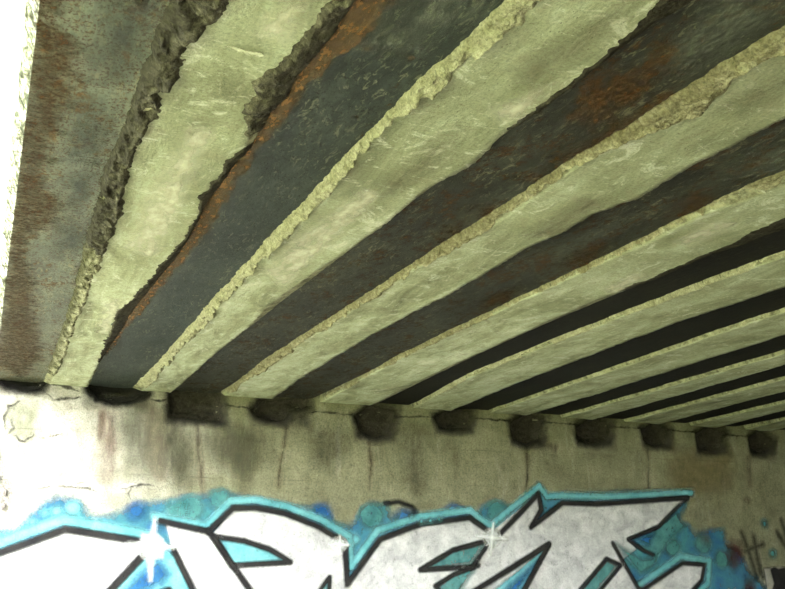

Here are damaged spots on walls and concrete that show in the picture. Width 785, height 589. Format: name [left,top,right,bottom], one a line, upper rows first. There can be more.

corrosion [0,0,76,377]
spalling [0,0,229,393]
corrosion [105,0,387,355]
spalling [85,0,541,407]
spalling [165,25,785,426]
spalling [507,0,692,130]